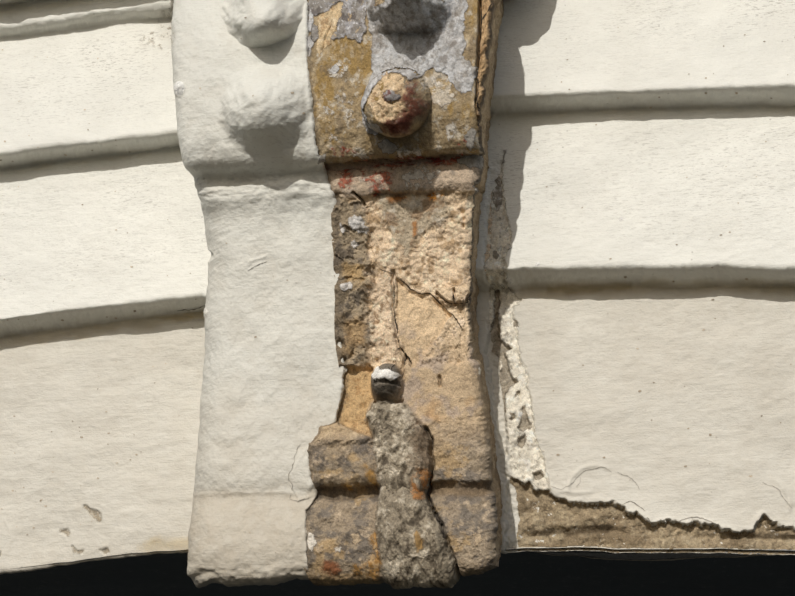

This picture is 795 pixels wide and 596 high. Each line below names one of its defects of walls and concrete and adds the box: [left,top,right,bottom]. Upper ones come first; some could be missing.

rust [384,82,429,134]
crack [379,268,471,377]
flaking render [303,0,795,590]
crack [420,425,460,573]